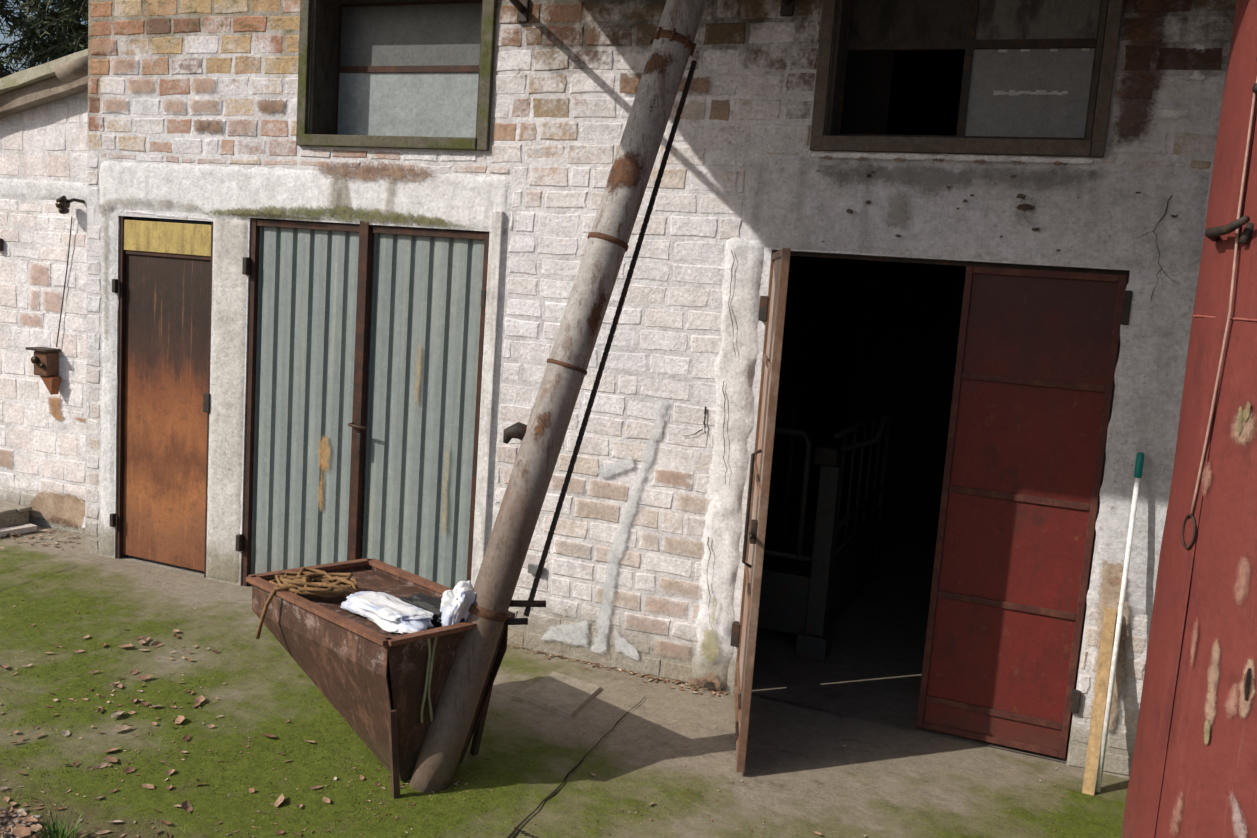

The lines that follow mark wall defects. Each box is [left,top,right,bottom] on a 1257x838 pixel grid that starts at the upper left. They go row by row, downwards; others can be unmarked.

crack [1134,195,1178,302]
rust [318,437,330,508]
peeling [1204,642,1255,745]